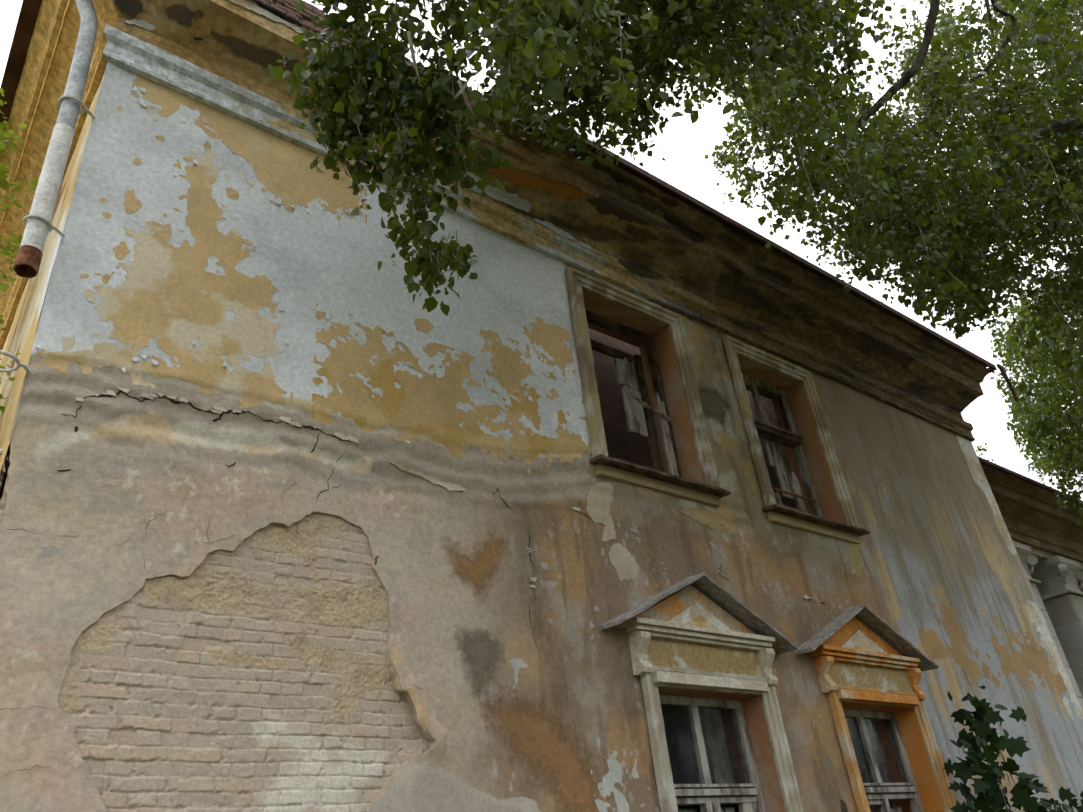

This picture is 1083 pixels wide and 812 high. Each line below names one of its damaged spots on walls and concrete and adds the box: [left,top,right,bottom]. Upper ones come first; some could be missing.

damp [114,0,143,16]
damp [166,4,203,26]
flaking render [229,0,334,49]
peeling [33,76,367,416]
damp [586,195,705,243]
peeling [311,303,593,475]
damp [698,388,730,424]
crack [62,387,366,515]
peeling [390,461,465,492]
peeling [586,482,639,581]
flaking render [57,513,449,812]
peeling [591,750,639,812]